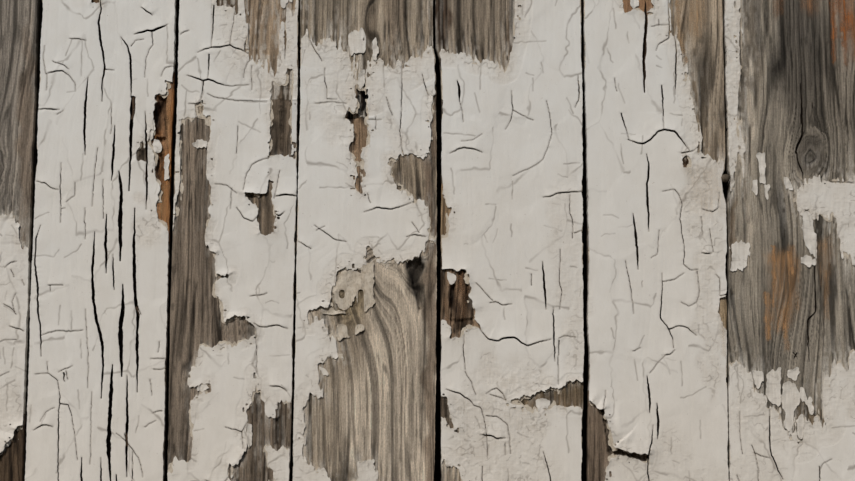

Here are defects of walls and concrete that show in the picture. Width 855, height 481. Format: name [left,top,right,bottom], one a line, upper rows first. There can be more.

peeling [0,413,25,481]
peeling [0,0,39,262]
crack [8,0,184,481]
peeling [129,72,268,478]
crack [190,7,252,104]
peeling [229,86,488,481]
peeling [213,0,521,201]
crack [449,346,504,439]
crack [485,259,562,359]
crack [621,2,698,289]
crack [646,281,699,481]
peeling [666,0,855,444]